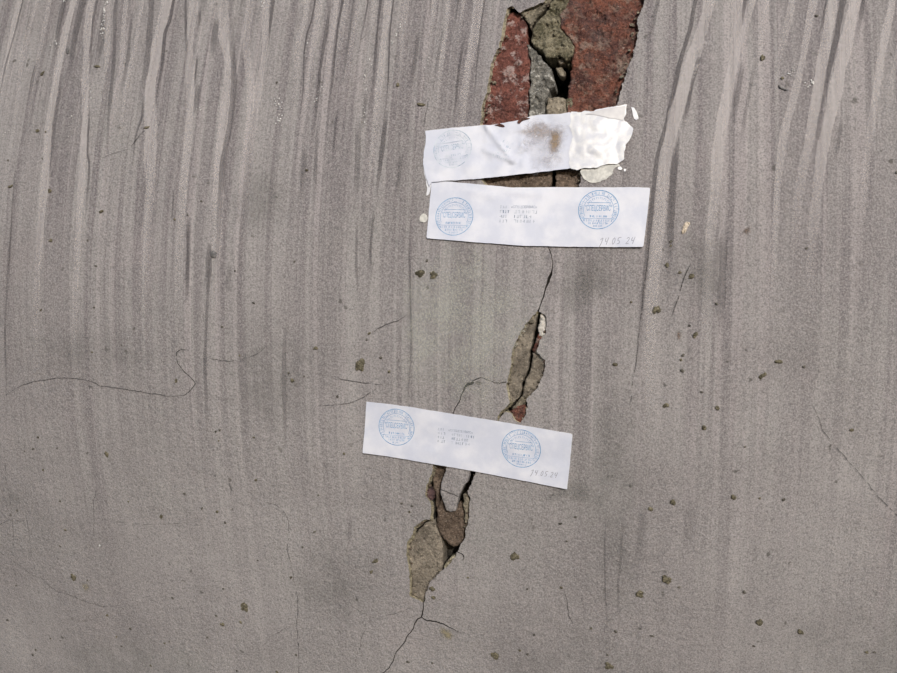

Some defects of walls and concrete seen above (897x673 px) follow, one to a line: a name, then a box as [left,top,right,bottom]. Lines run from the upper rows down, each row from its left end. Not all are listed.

water stain [161,0,187,66]
water stain [367,0,406,82]
spalling [480,0,644,125]
water stain [675,0,695,93]
water stain [830,0,846,69]
spalling [481,168,581,188]
crack [537,249,553,311]
crack [7,349,195,396]
crack [453,377,506,414]
spalling [497,311,547,423]
spalling [406,464,476,602]
crack [383,601,458,673]